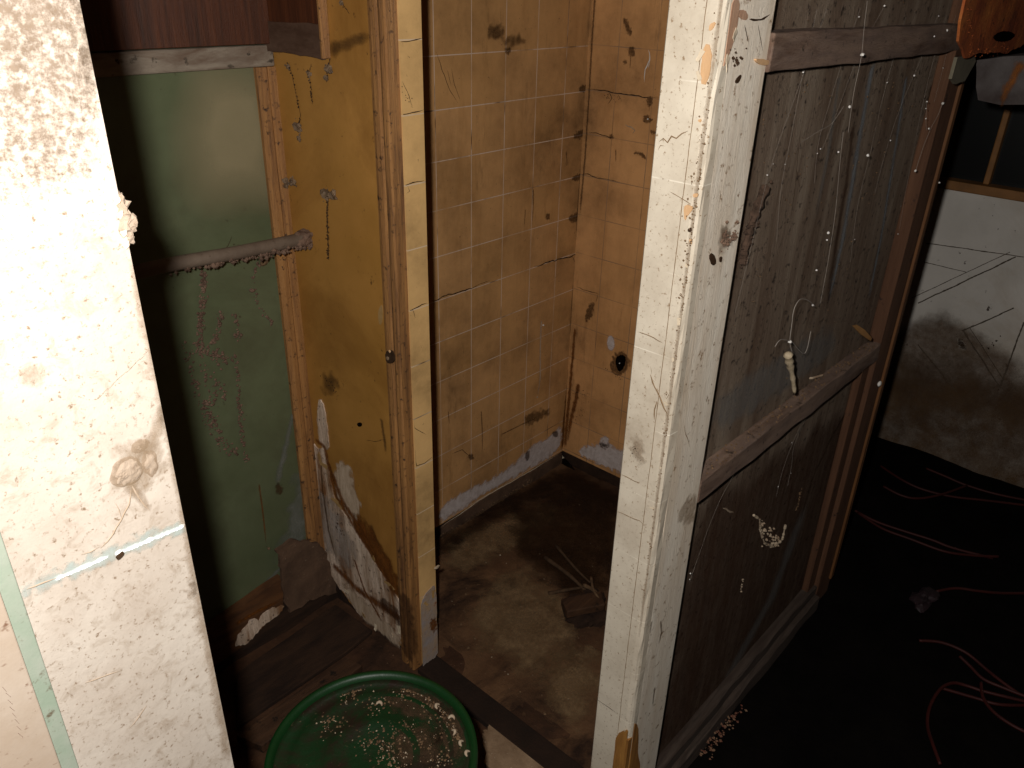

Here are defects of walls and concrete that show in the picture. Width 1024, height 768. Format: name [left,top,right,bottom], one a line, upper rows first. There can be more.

peeling [696,0,748,84]
leakage [569,1,595,222]
crack [590,89,655,101]
peeling [676,80,712,331]
crack [534,254,598,300]
leakage [439,329,576,520]
leakage [579,436,641,474]
peeling [314,399,401,647]
rust [352,514,399,595]
peeling [235,603,284,646]